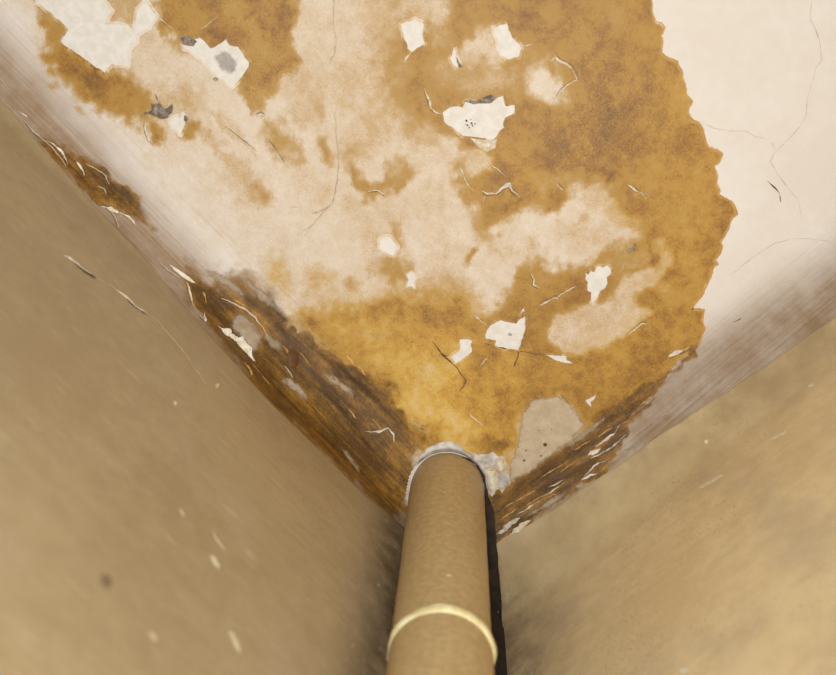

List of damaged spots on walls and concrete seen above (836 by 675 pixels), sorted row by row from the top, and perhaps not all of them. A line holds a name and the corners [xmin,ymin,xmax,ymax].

leakage [42,140,154,229]
leakage [38,7,166,146]
peeling [35,0,252,89]
leakage [153,0,325,166]
peeling [398,16,428,62]
peeling [424,88,519,203]
peeling [491,20,532,62]
crack [700,2,823,218]
leakage [183,0,738,542]
peeling [541,263,614,306]
crack [432,341,466,392]
peeling [448,307,528,366]